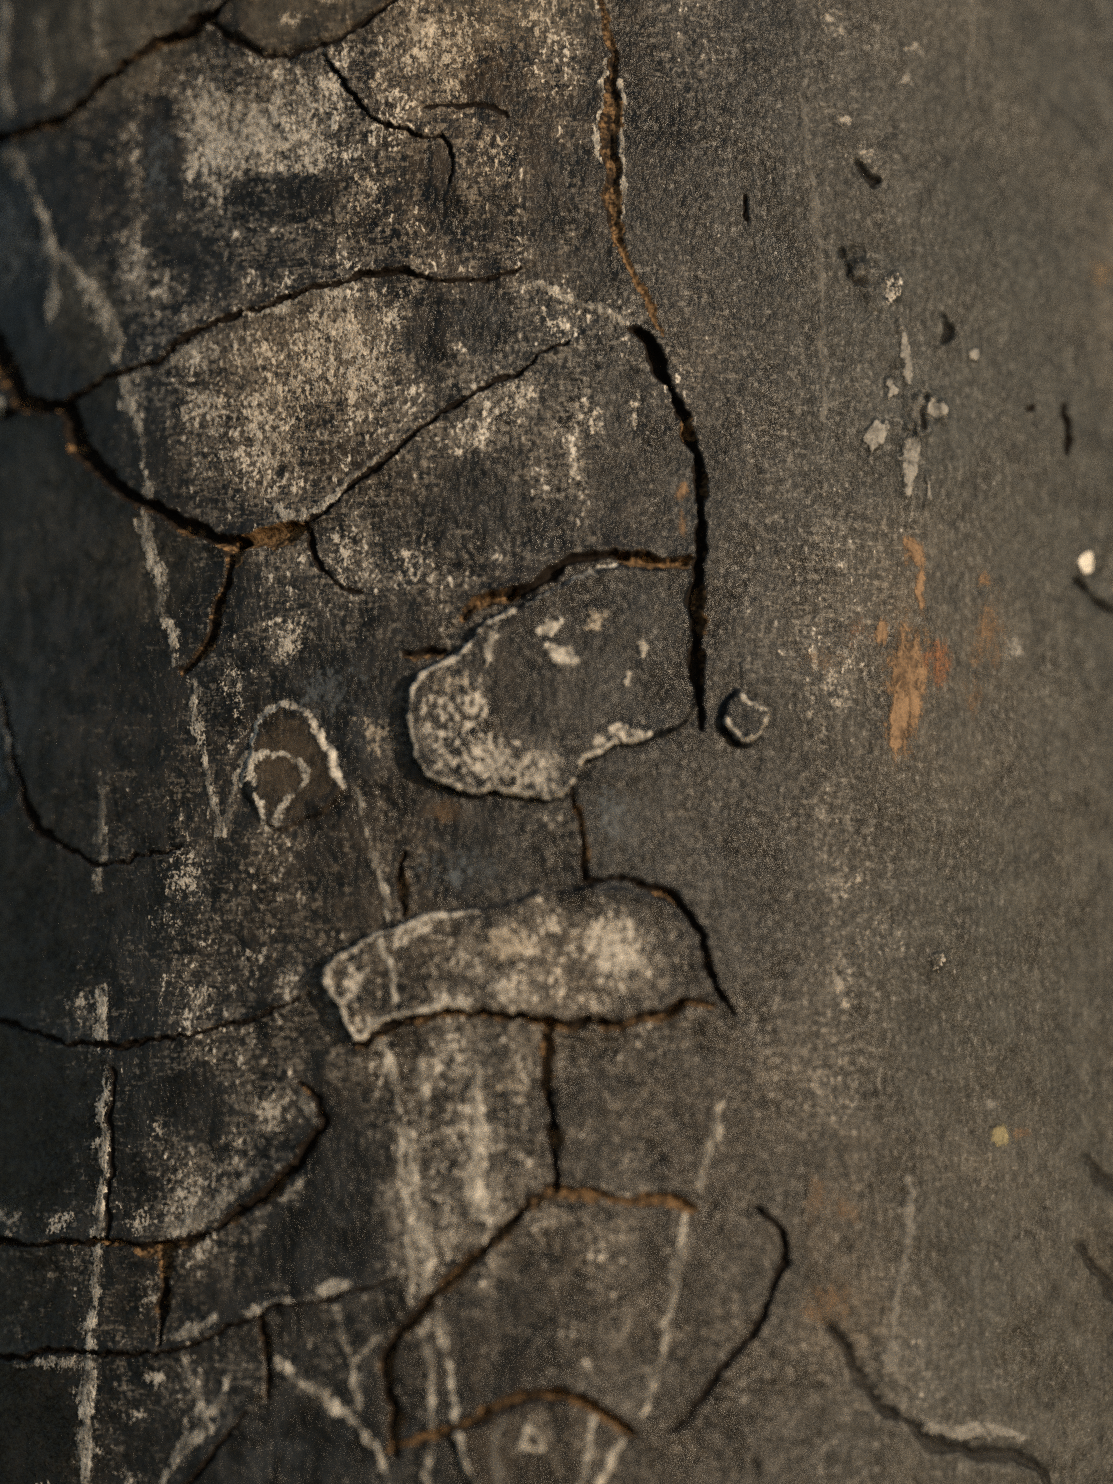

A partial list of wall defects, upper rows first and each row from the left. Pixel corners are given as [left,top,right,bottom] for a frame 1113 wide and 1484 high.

crack [0,0,509,184]
crack [0,266,571,676]
crack [401,0,709,732]
crack [742,194,750,223]
crack [0,683,183,867]
crack [0,997,387,1484]
crack [355,786,790,1460]